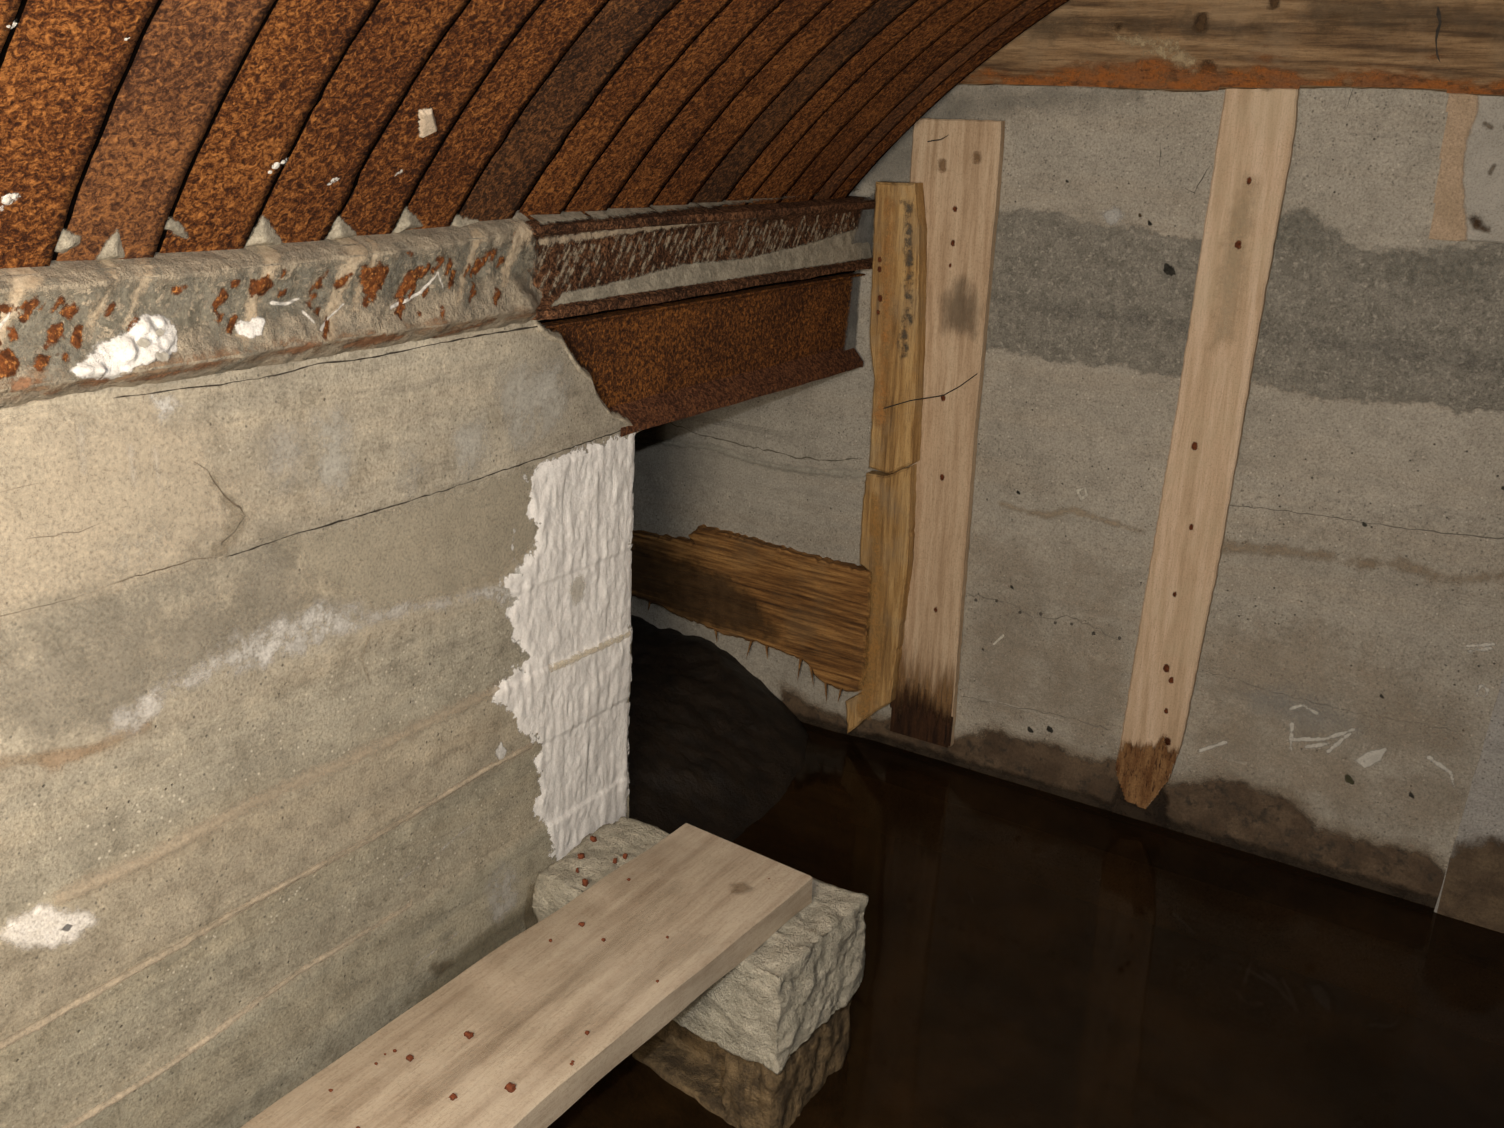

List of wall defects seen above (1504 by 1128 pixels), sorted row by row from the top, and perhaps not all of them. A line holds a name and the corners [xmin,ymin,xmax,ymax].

rust [0,248,535,397]
crack [115,325,545,398]
leakage [0,218,756,380]
leakage [986,208,1202,376]
leakage [1251,208,1504,413]
leakage [0,473,534,768]
crack [1,430,621,616]
peeling [477,321,640,861]
leakage [782,496,1504,933]
efflorescence [0,905,96,949]